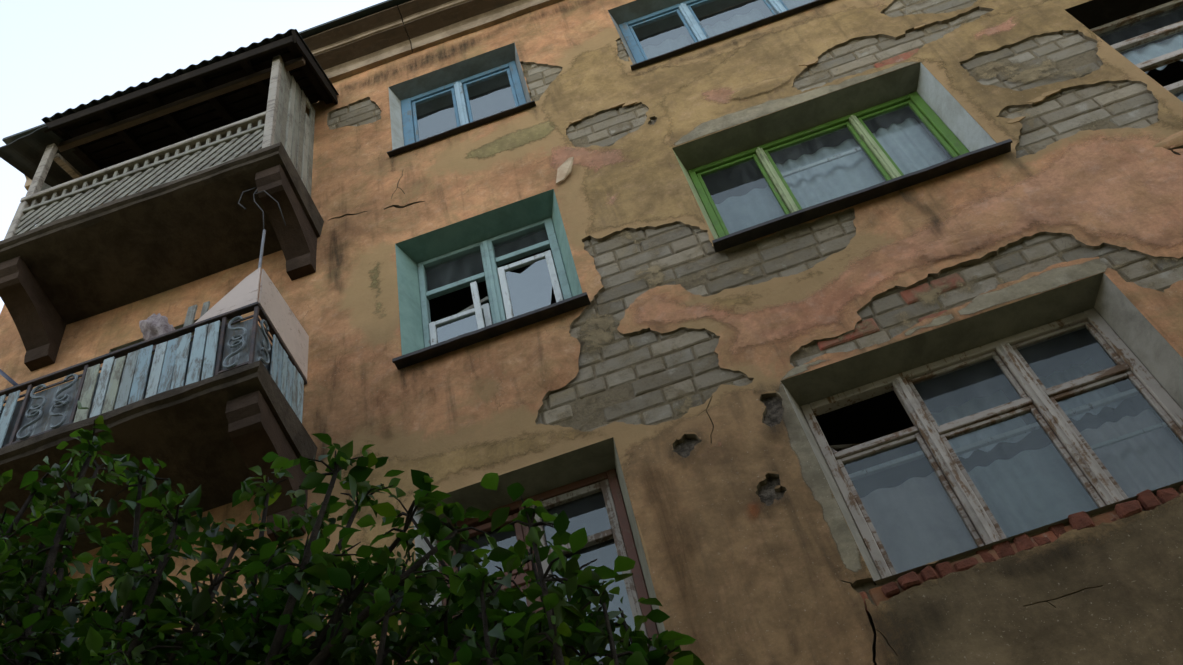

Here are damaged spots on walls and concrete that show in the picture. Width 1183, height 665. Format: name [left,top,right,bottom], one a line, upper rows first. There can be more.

spalling [327,97,381,130]
crack [328,169,425,221]
peeling [343,0,1183,665]
crack [841,580,897,665]
crack [1023,585,1103,608]